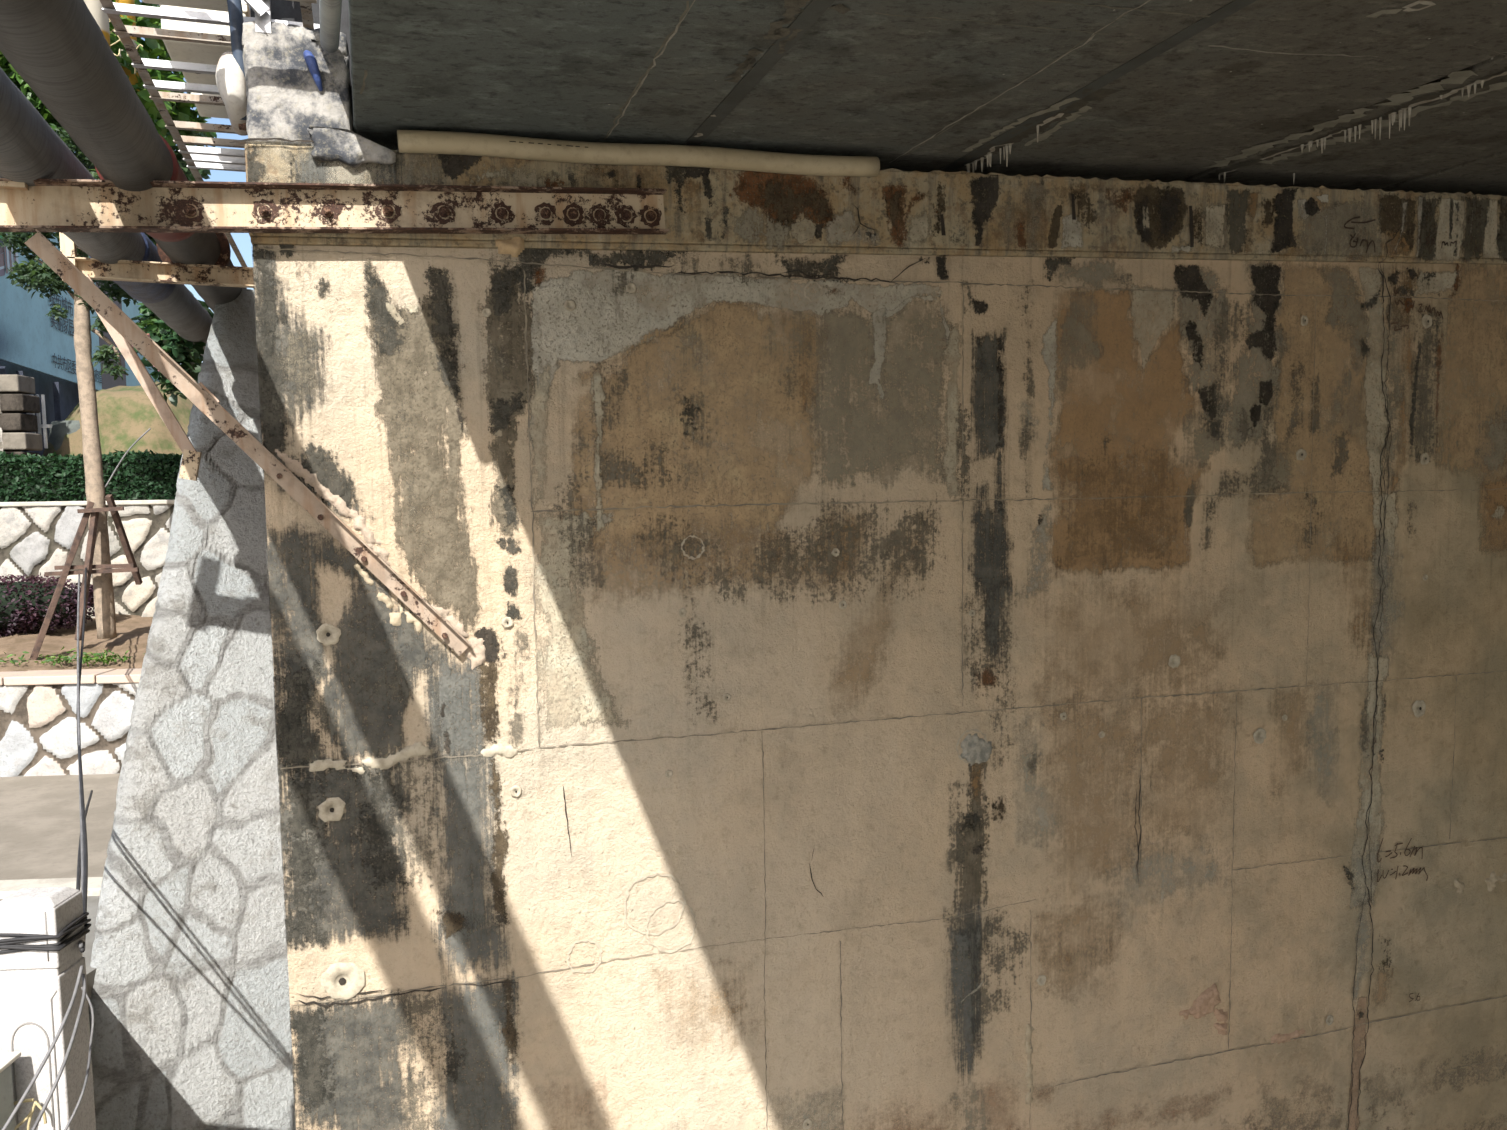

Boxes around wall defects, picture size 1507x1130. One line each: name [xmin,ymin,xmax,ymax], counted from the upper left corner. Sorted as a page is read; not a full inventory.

rust [176,197,204,224]
water stain [246,143,266,182]
rust [251,199,279,223]
rust [375,199,401,223]
rust [534,202,662,228]
rust [717,170,967,249]
water stain [956,89,1132,289]
peeling [527,267,950,730]
water stain [252,147,1058,1130]
water stain [1173,52,1507,1130]
crack [1347,226,1401,1130]
crack [1134,774,1151,881]